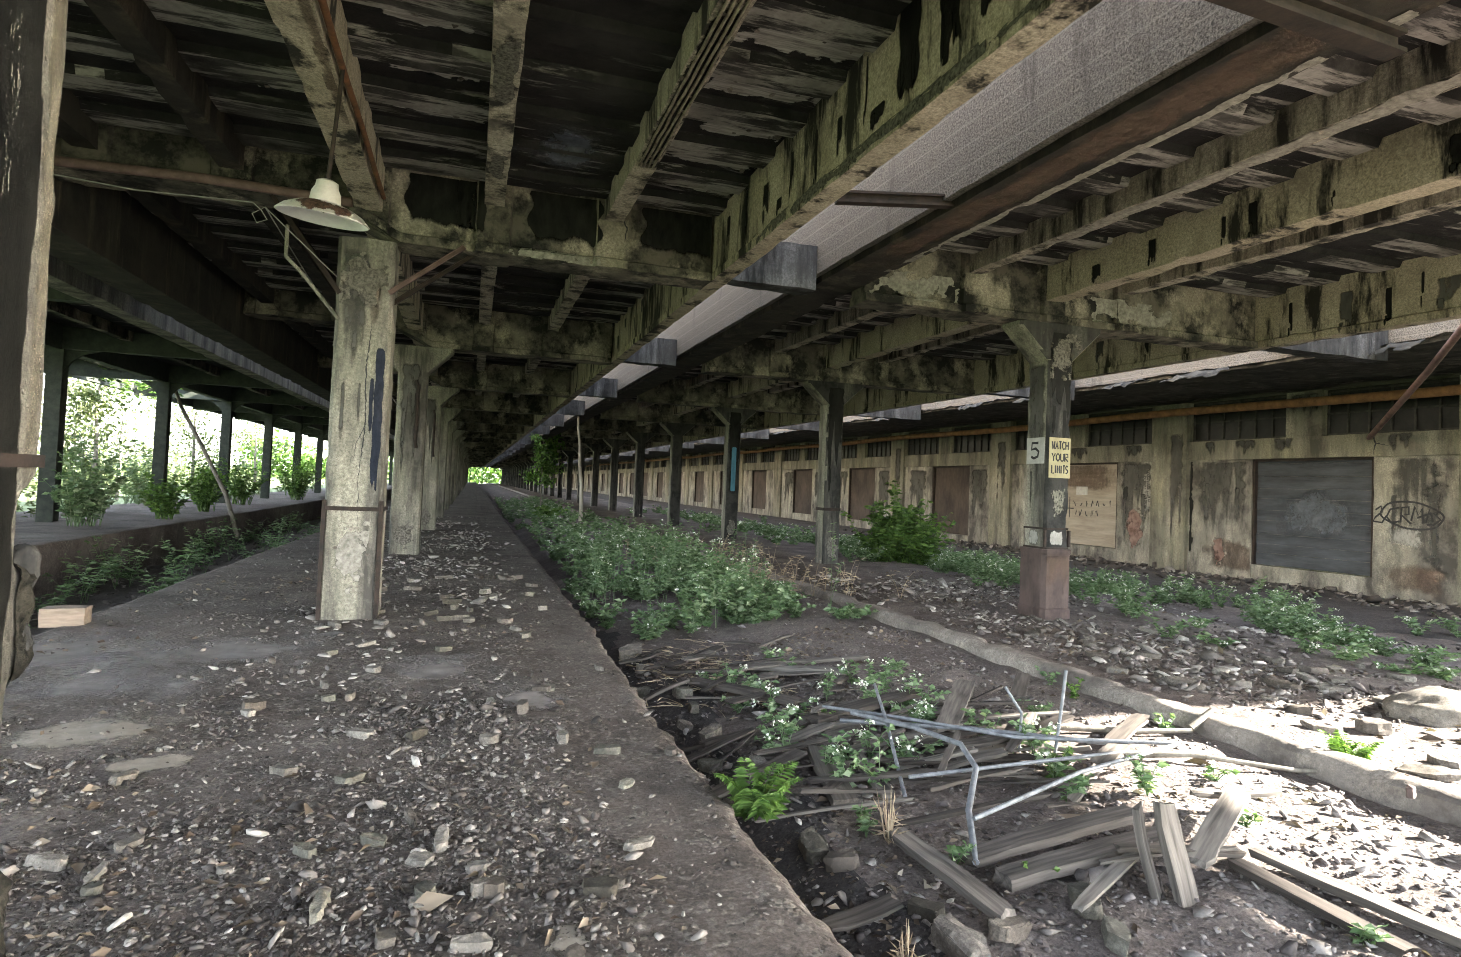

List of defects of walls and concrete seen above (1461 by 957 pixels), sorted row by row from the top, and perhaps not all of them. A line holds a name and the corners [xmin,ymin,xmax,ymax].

peeling [383,9,475,34]
peeling [390,64,480,82]
leakage [863,0,922,130]
leakage [940,0,961,66]
leakage [641,151,794,258]
leakage [1383,287,1392,325]
leakage [1420,271,1461,309]
leakage [1121,445,1151,536]
leakage [1170,434,1255,551]
leakage [1388,432,1445,566]
spalling [6,562,37,687]
spalling [0,871,12,957]